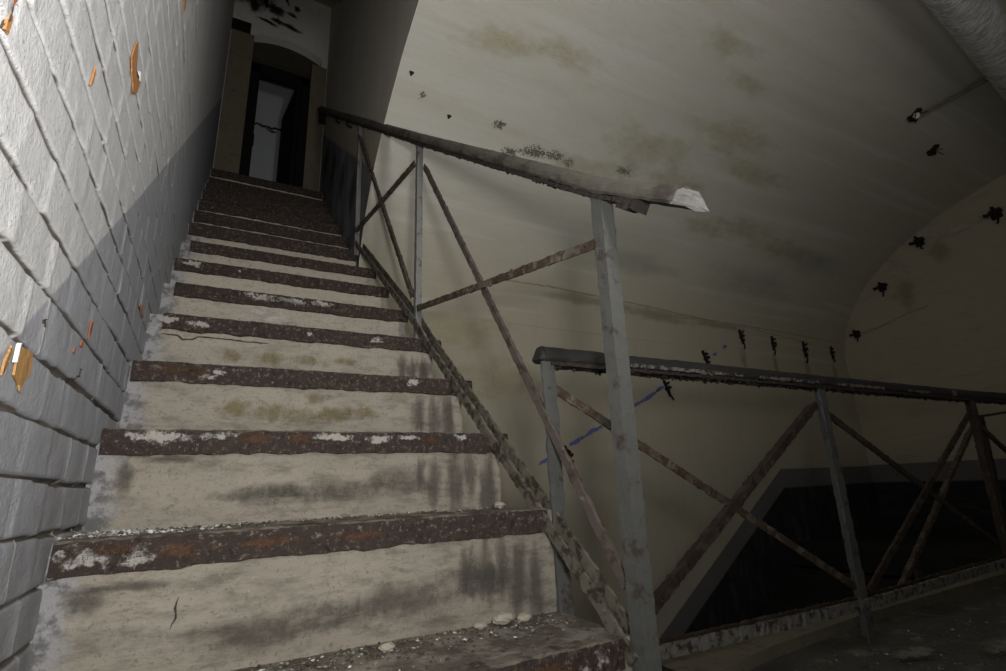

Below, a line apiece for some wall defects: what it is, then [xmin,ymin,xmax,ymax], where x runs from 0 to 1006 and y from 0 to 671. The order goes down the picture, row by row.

peeling [2,0,18,34]
flaking render [241,0,301,33]
peeling [131,41,142,94]
leakage [503,144,574,168]
crack [162,333,268,344]
peeling [0,343,33,392]
leakage [416,401,452,432]
leakage [450,464,492,509]
leakage [463,550,540,605]